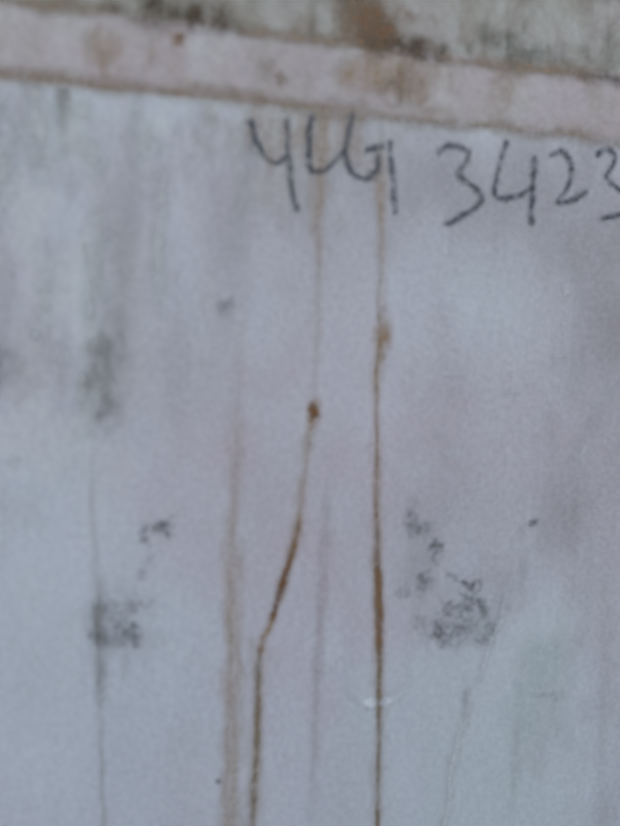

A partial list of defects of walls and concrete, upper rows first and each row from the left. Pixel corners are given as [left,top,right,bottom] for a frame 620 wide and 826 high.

water stain [145,0,202,26]
water stain [475,34,569,75]
corrosion [309,402,319,422]